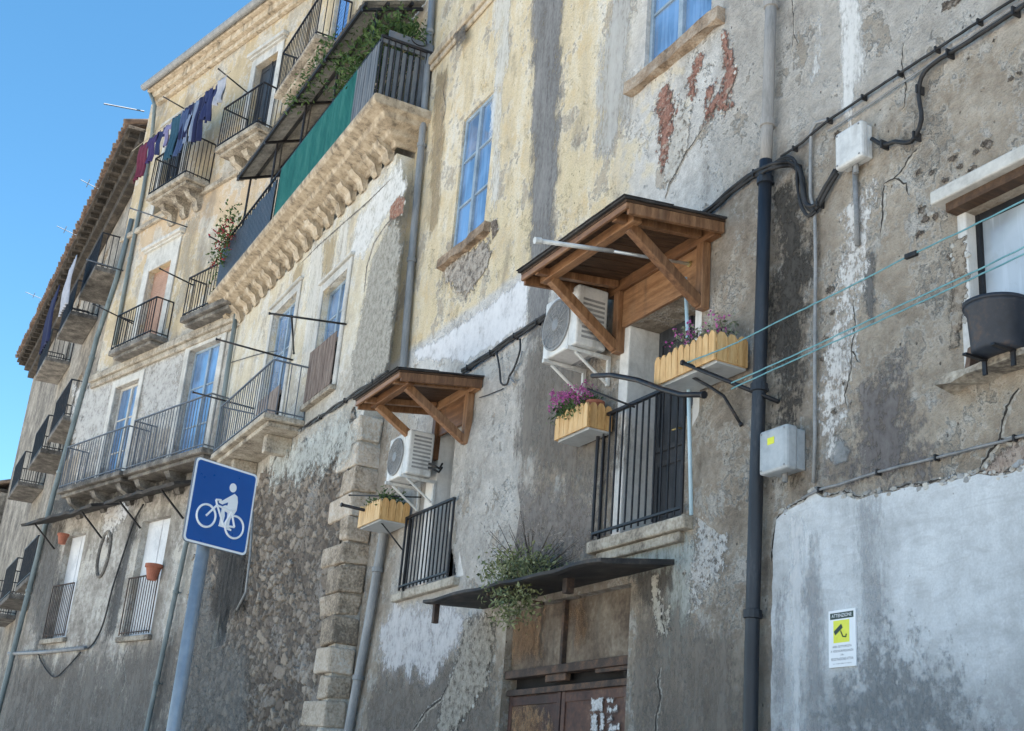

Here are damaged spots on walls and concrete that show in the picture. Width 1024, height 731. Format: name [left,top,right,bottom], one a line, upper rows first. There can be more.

water stain [528,0,564,259]
spalling [654,29,739,190]
spalling [389,196,406,219]
spalling [445,218,499,300]
water stain [768,180,820,429]
crack [844,300,860,409]
crack [880,149,919,236]
crack [769,388,1024,561]
spalling [778,437,1024,515]
spalling [651,573,673,637]
spalling [682,517,736,623]